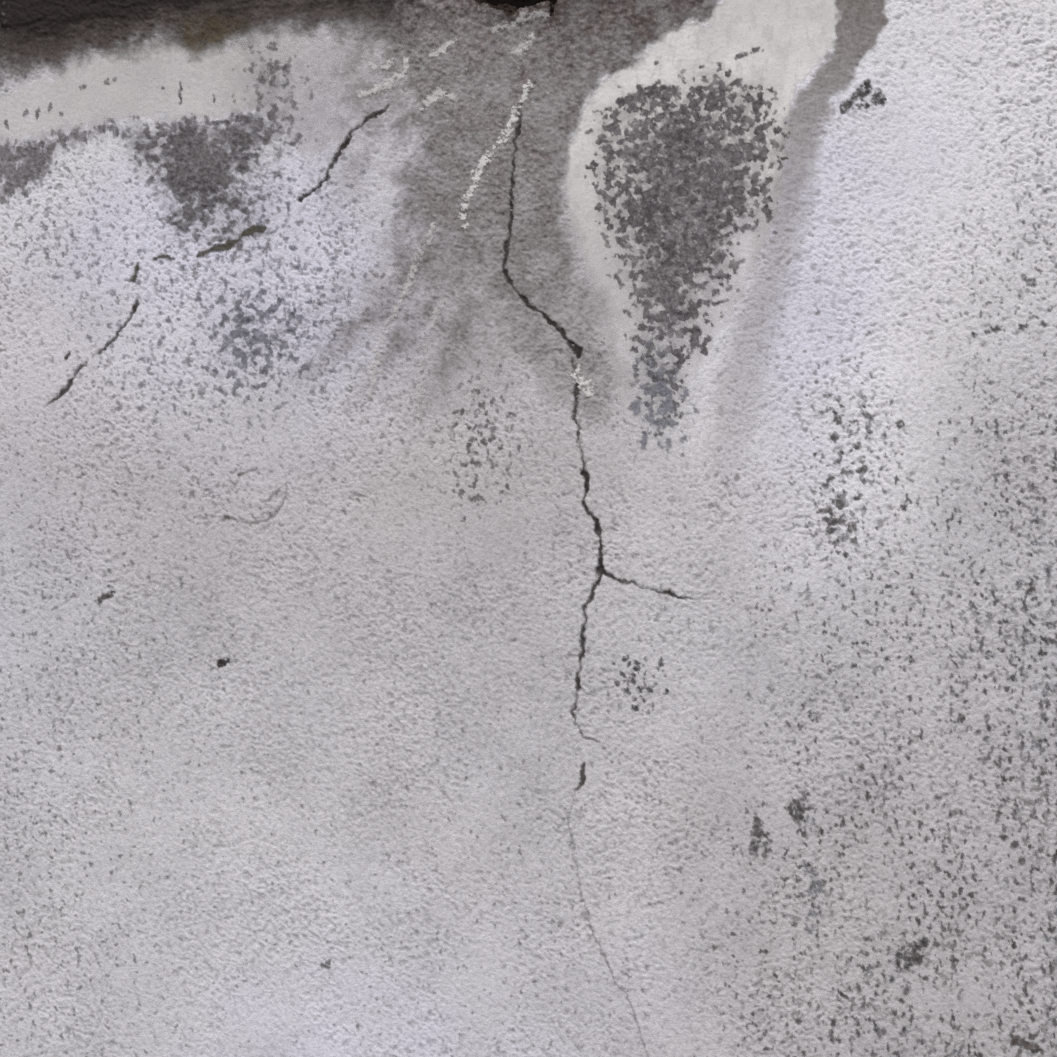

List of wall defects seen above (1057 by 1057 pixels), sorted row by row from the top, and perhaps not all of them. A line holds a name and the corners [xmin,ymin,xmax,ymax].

spalling [474,0,557,17]
crack [299,104,389,202]
water stain [0,0,888,448]
crack [49,299,139,403]
water stain [452,390,520,501]
crack [502,103,688,790]
water stain [813,394,904,569]
water stain [984,459,1045,524]
water stain [950,543,1057,818]
water stain [776,755,1057,1057]